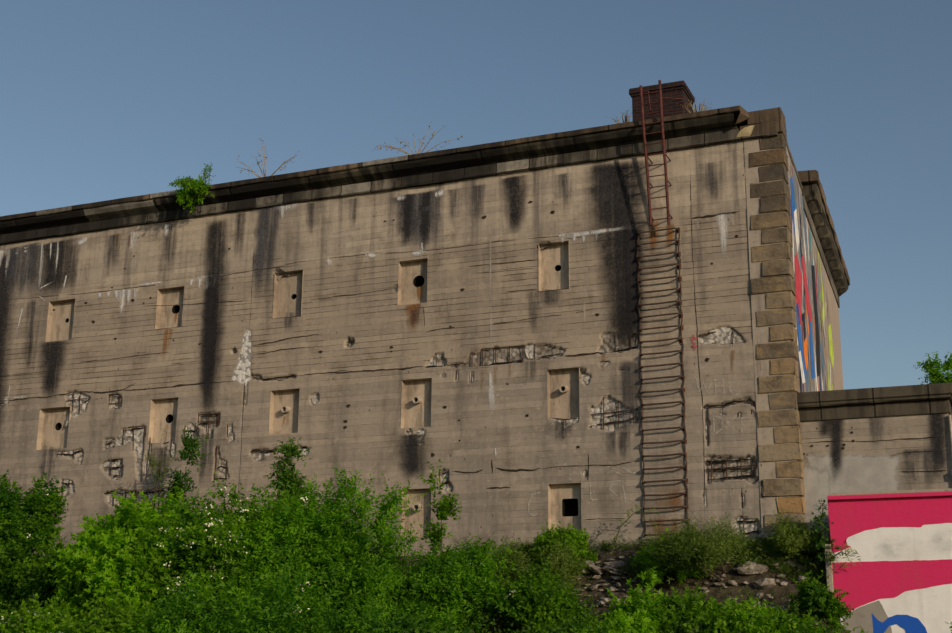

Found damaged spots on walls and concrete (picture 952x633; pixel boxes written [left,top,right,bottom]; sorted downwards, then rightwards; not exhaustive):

water stain [395,190,456,255]
water stain [503,176,525,228]
water stain [559,163,642,332]
water stain [0,237,87,415]
water stain [190,221,225,397]
spalling [426,344,565,383]
spalling [698,327,745,347]
spalling [102,425,164,508]
spalling [184,412,234,481]
spalling [551,397,639,432]
water stain [610,363,639,448]
spalling [704,399,762,535]